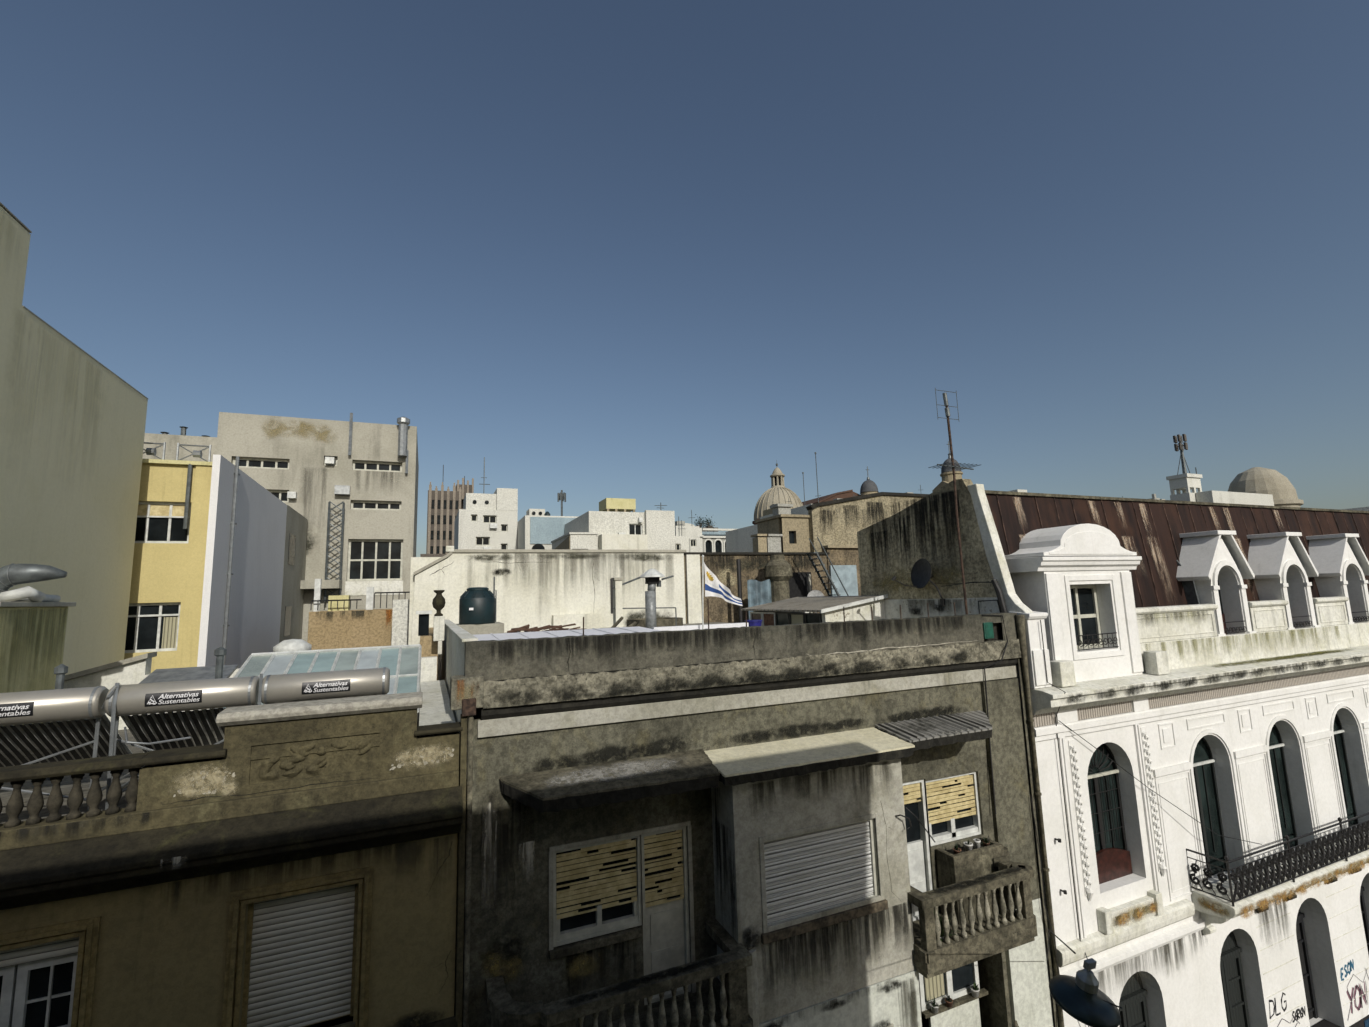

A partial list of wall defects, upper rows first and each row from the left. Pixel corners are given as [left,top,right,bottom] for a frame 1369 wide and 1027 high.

leakage [822,491,960,553]
leakage [493,641,513,657]
leakage [599,635,616,649]
leakage [696,627,759,643]
leakage [924,651,967,664]
leakage [557,659,907,699]
rust [1202,859,1369,918]
leakage [744,903,912,976]
leakage [1099,934,1201,984]